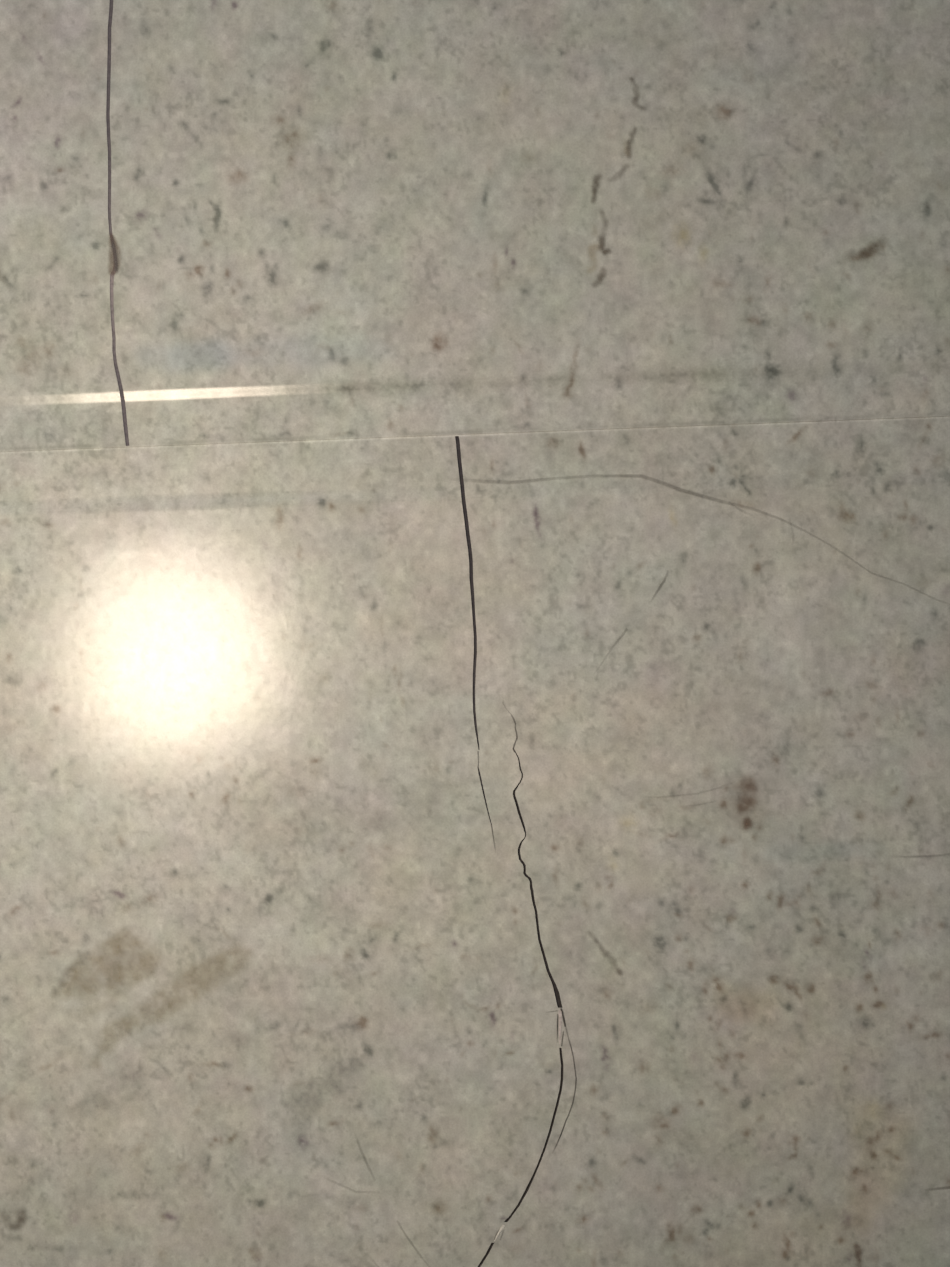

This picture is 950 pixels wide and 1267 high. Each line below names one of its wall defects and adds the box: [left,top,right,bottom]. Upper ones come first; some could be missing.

crack [106,0,129,446]
crack [455,436,577,1267]